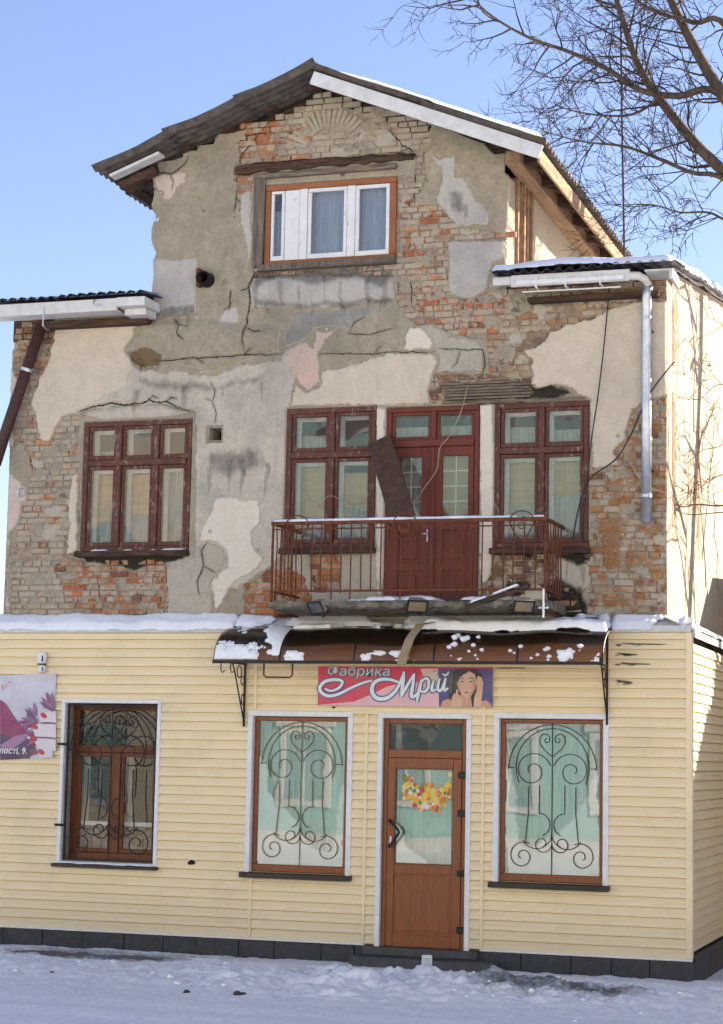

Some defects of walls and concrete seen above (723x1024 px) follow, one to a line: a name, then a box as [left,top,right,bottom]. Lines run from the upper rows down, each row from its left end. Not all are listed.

crack [77,272,280,423]
peeling [4,91,677,619]
crack [321,318,486,373]